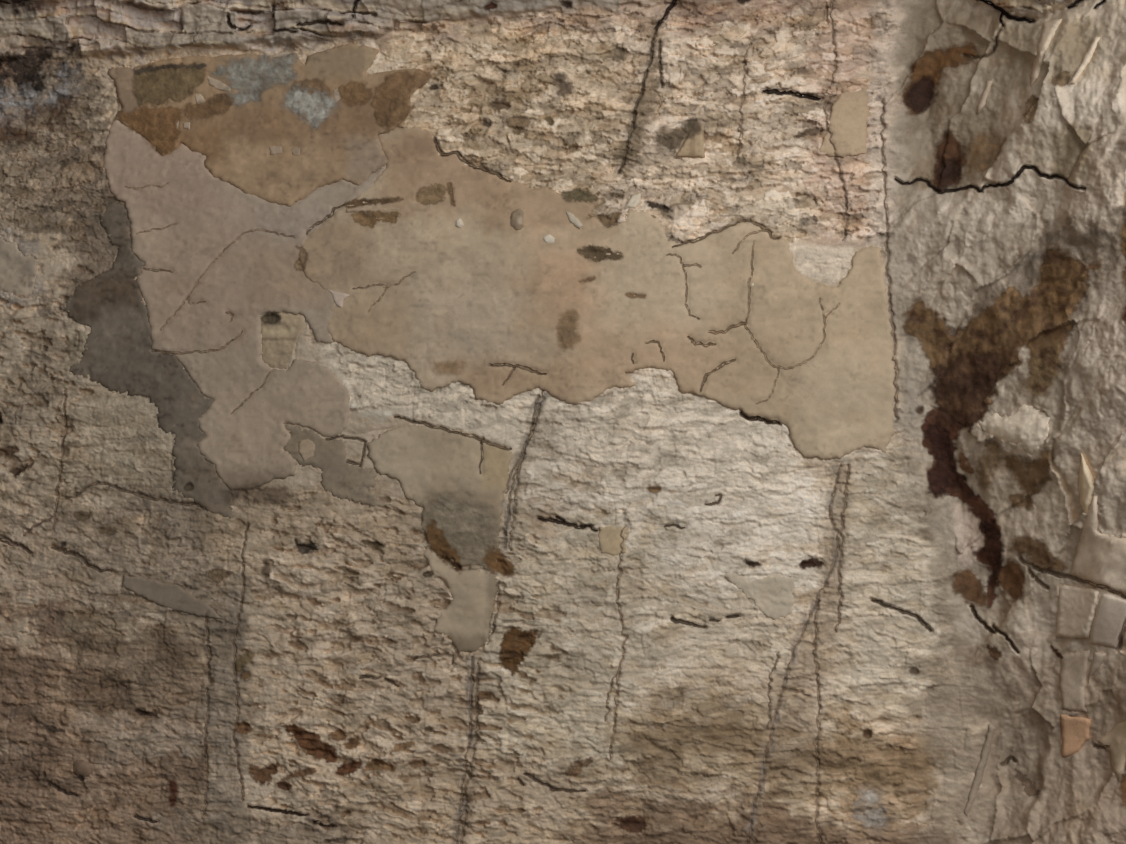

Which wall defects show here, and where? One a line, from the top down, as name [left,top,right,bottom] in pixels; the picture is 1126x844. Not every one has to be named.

crack [963,0,1034,59]
crack [1067,0,1105,9]
leakage [0,64,75,129]
peeling [195,75,231,104]
crack [617,0,676,174]
corrosion [903,43,977,114]
corrosion [932,130,967,191]
crack [880,98,1086,423]
spalling [260,312,306,369]
peeling [299,439,315,462]
corrosion [922,403,1025,607]
corrosion [426,521,461,571]